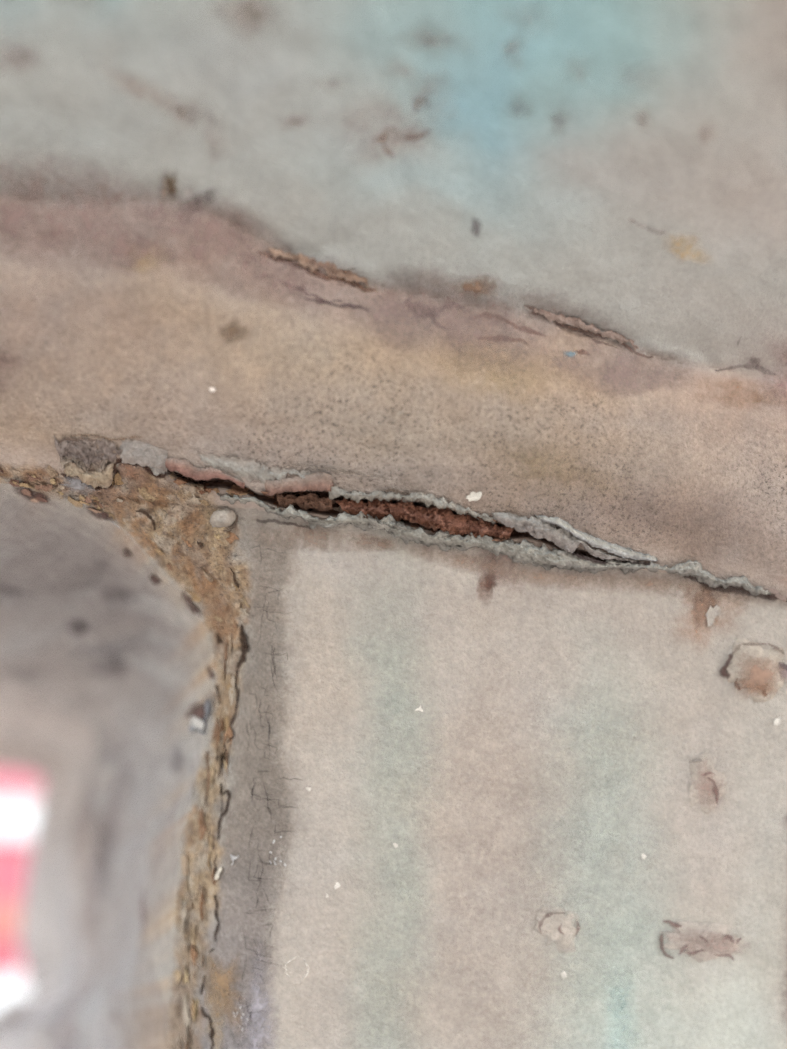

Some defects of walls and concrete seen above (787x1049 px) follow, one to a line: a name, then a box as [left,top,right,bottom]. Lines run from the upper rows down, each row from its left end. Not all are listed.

corrosion [0,465,126,522]
corrosion [136,487,158,530]
peeling [54,434,243,490]
crack [165,451,787,602]
corrosion [173,616,237,1049]
crack [200,624,254,1049]